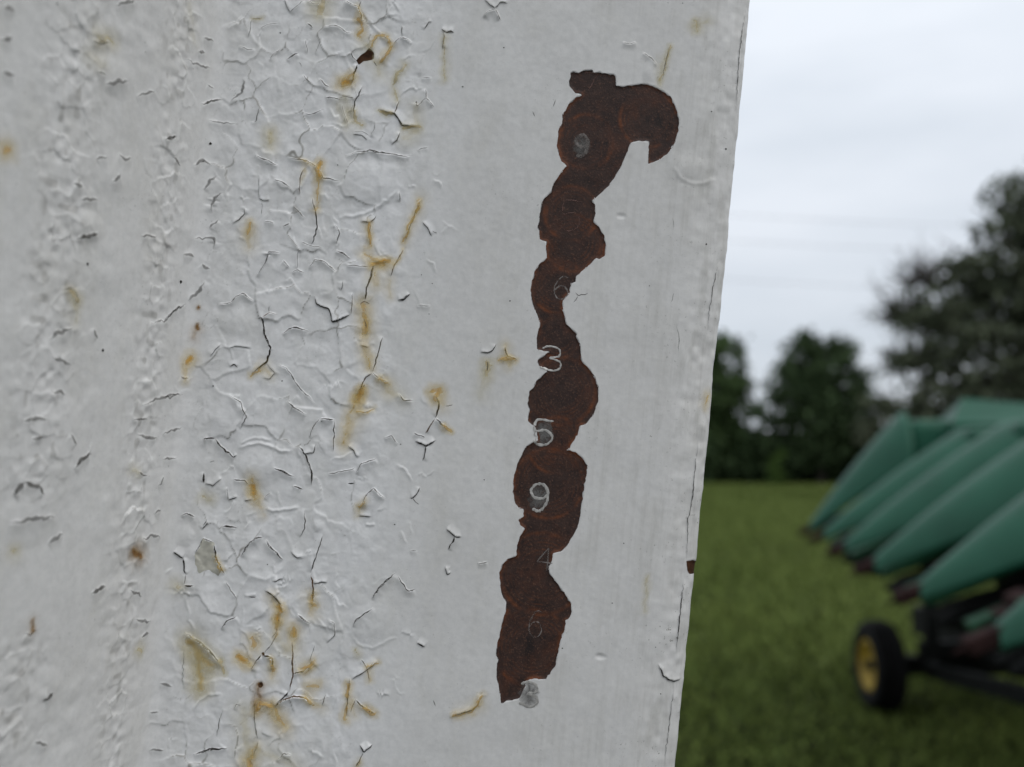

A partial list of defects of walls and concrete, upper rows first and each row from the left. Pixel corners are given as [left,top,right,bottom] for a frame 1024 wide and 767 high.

peeling [356,48,374,64]
crack [174,0,456,767]
peeling [194,539,221,576]
crack [445,523,462,575]
crack [433,693,489,718]